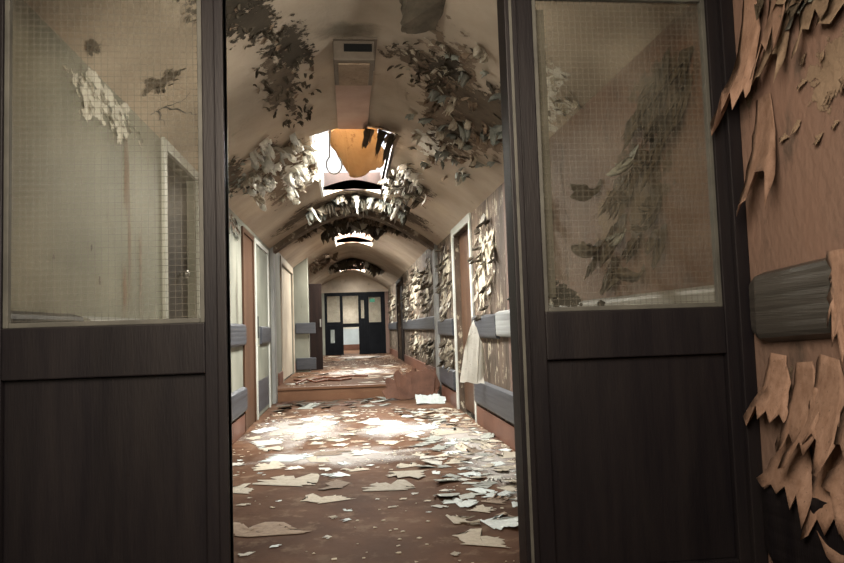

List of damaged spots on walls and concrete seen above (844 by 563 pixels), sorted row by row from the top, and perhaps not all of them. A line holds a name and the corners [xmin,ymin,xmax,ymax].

flaking render [86,38,101,57]
peeling [176,0,197,26]
peeling [62,64,144,147]
peeling [226,0,503,278]
peeling [545,59,582,132]
peeling [570,46,694,295]
peeling [388,244,453,323]
peeling [407,330,455,372]